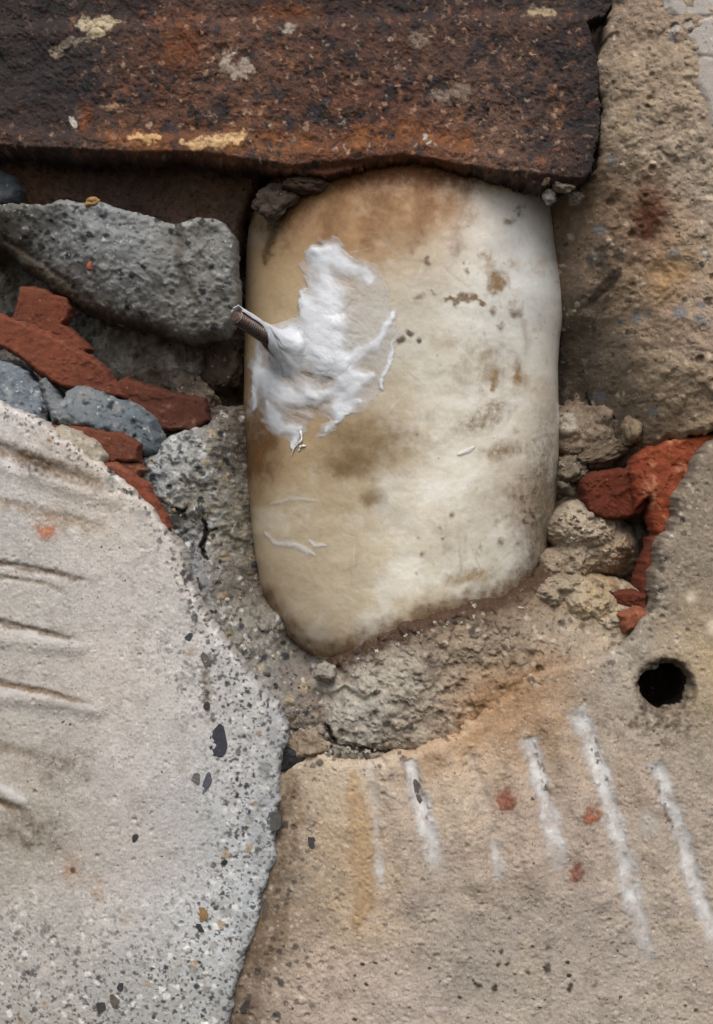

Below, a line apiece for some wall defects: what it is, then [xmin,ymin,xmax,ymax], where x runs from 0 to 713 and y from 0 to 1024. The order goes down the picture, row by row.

rust [330,165,479,189]
damp [246,420,276,478]
crack [171,508,219,560]